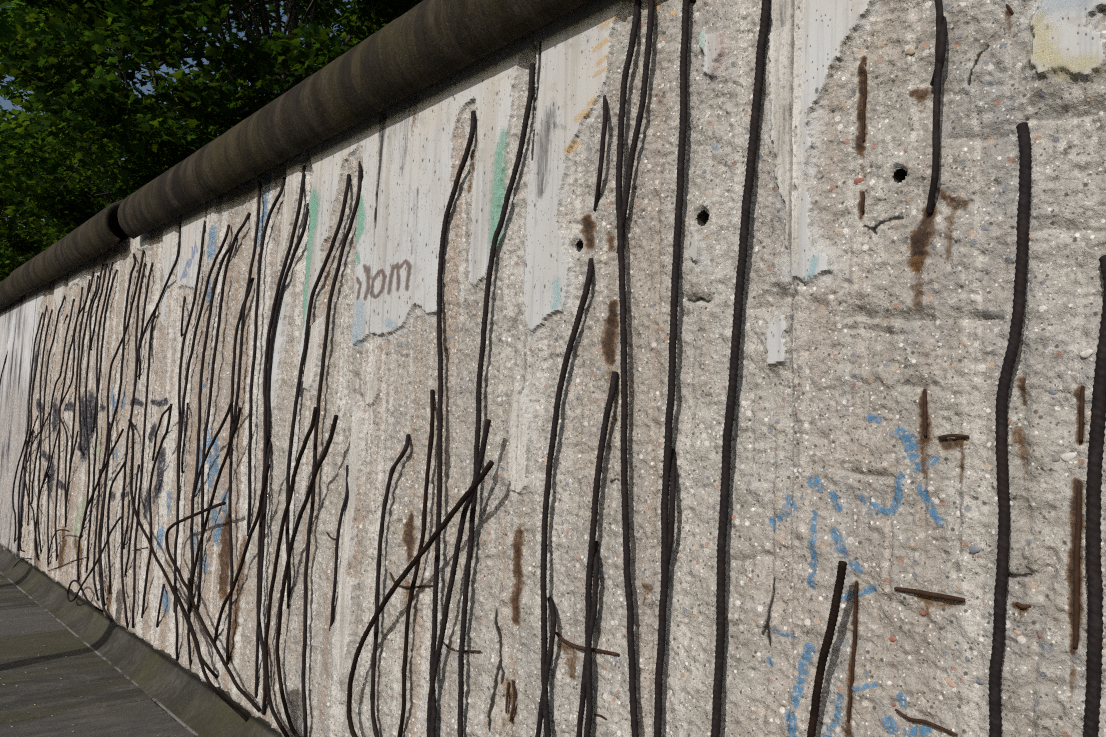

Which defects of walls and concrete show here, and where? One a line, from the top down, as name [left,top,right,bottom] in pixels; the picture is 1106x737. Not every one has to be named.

corrosion [855,55,868,169]
corrosion [908,187,968,307]
spalling [12,224,164,630]
spalling [152,407,169,461]
spalling [181,403,189,473]
corrosion [918,388,965,483]
corrosion [1074,386,1085,445]
spalling [82,514,136,633]
spalling [134,524,179,661]
spalling [175,573,188,611]
corrosion [510,528,524,625]
corrosion [1066,477,1085,655]